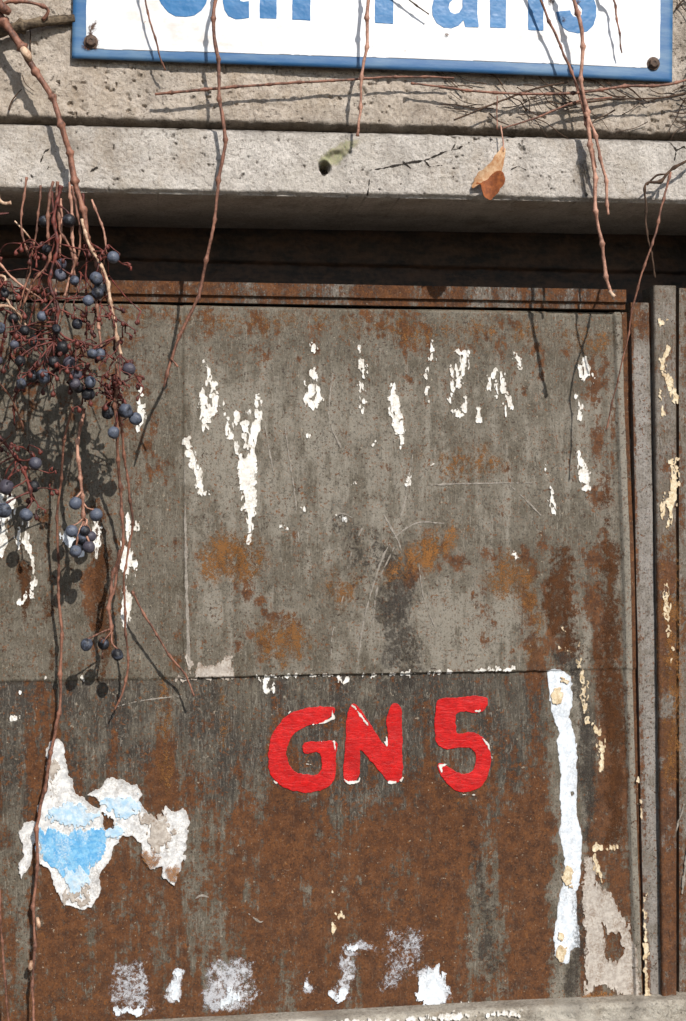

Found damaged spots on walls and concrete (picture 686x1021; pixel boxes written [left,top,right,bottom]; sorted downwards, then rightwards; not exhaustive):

peeling [182,436,210,496]
peeling [197,359,262,545]
peeling [303,367,324,411]
peeling [387,382,406,450]
peeling [447,349,482,423]
peeling [659,457,681,530]
peeling [0,493,38,606]
rust [199,531,269,584]
rust [379,520,468,583]
rust [484,489,630,852]
rust [659,532,685,786]
peeling [547,642,651,997]